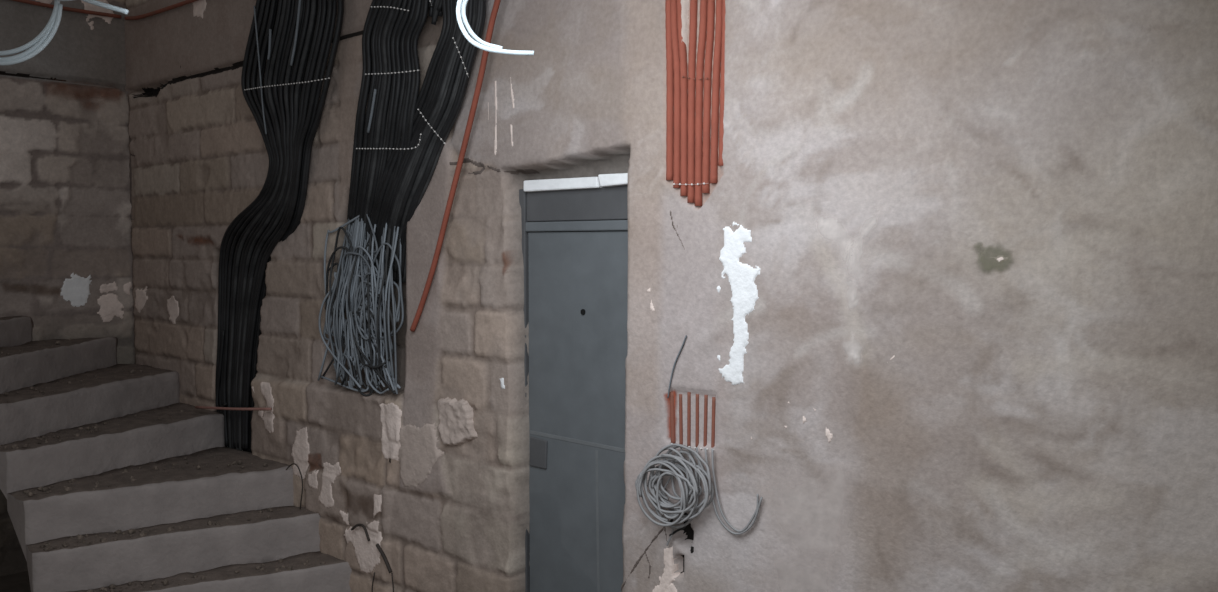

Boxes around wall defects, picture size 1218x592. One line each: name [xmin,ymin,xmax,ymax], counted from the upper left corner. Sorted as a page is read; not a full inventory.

crack [168,60,244,85]
leakage [976,244,1011,271]
peeling [717,222,761,385]
peeling [307,470,319,489]
peeling [652,521,694,592]